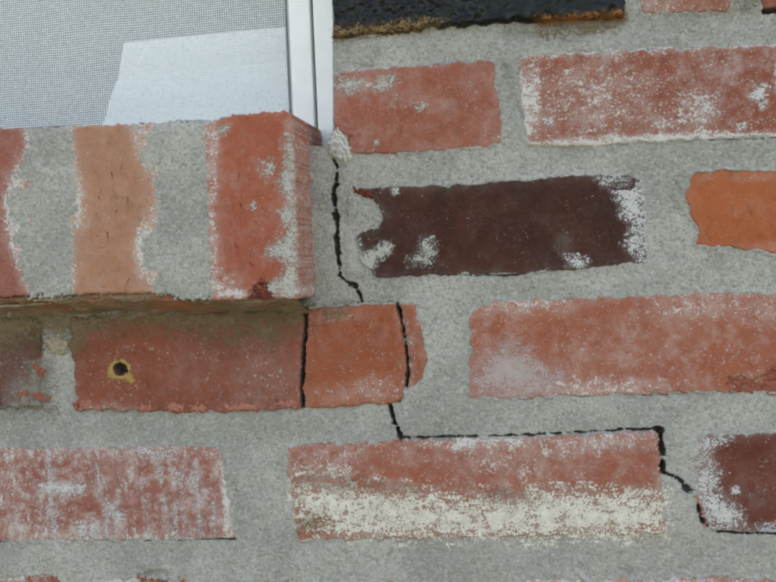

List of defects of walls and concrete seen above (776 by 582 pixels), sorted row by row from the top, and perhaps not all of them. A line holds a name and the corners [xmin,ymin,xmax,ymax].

peeling [248,131,300,300]
crack [300,306,311,408]
crack [331,159,776,535]
spalling [728,365,776,396]
efflorescence [33,446,128,540]
efflorescence [132,443,220,542]
efflorescence [283,466,676,549]